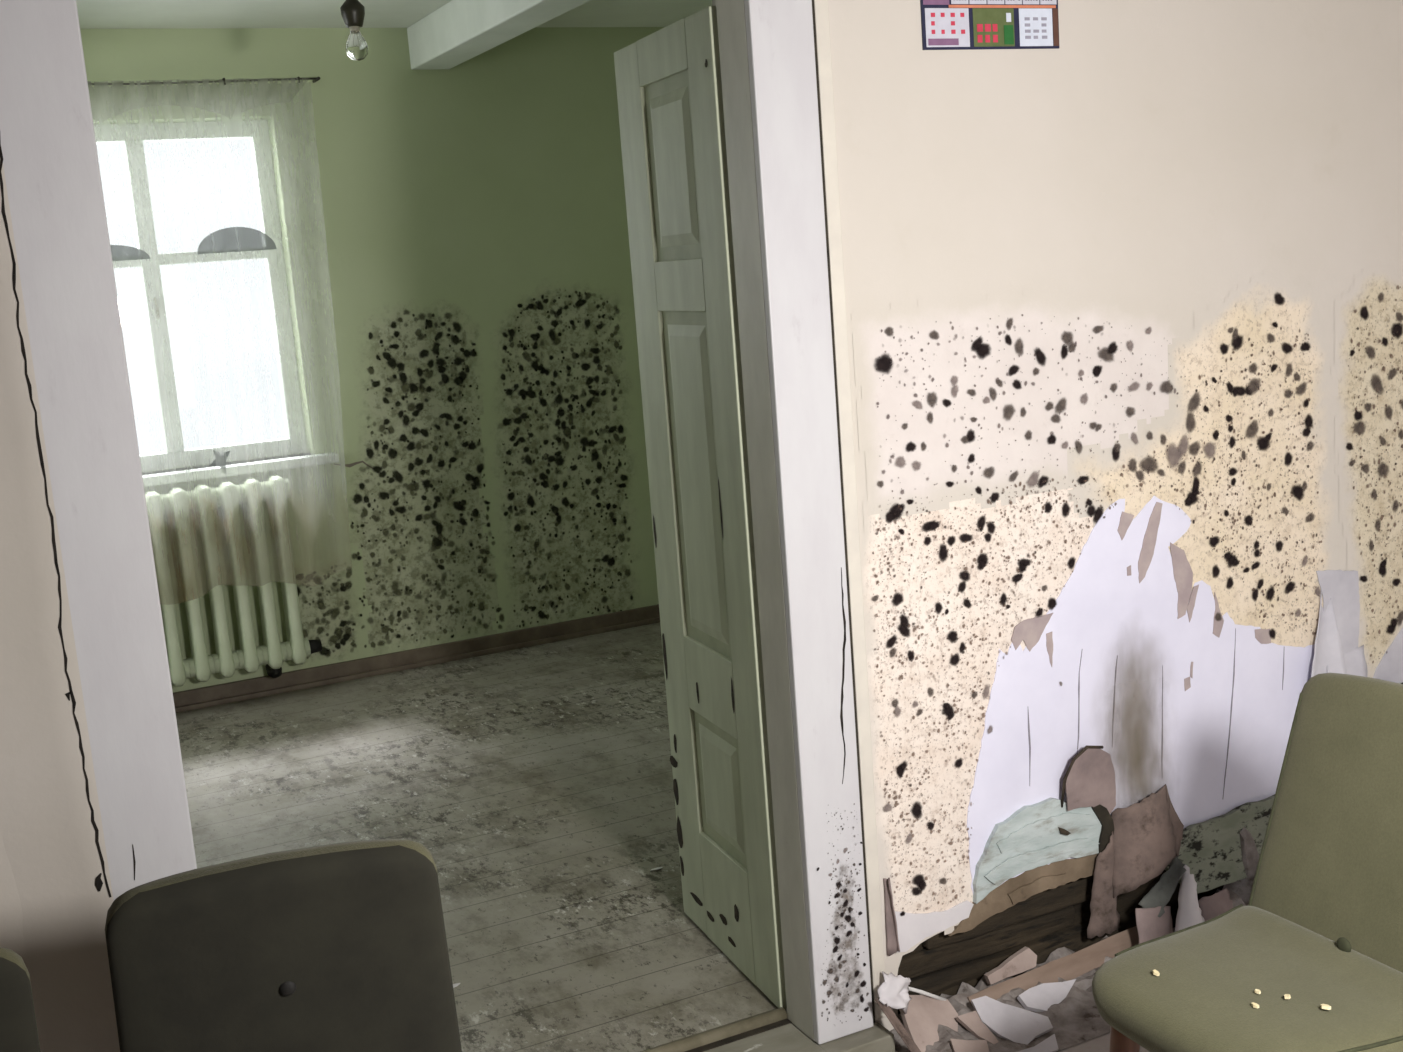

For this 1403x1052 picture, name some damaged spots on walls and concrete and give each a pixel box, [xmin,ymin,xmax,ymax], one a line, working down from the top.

crack [0,140,136,898]
leakage [275,269,655,672]
crack [839,567,847,784]
spalling [943,798,1114,936]
leakage [817,265,1403,1021]